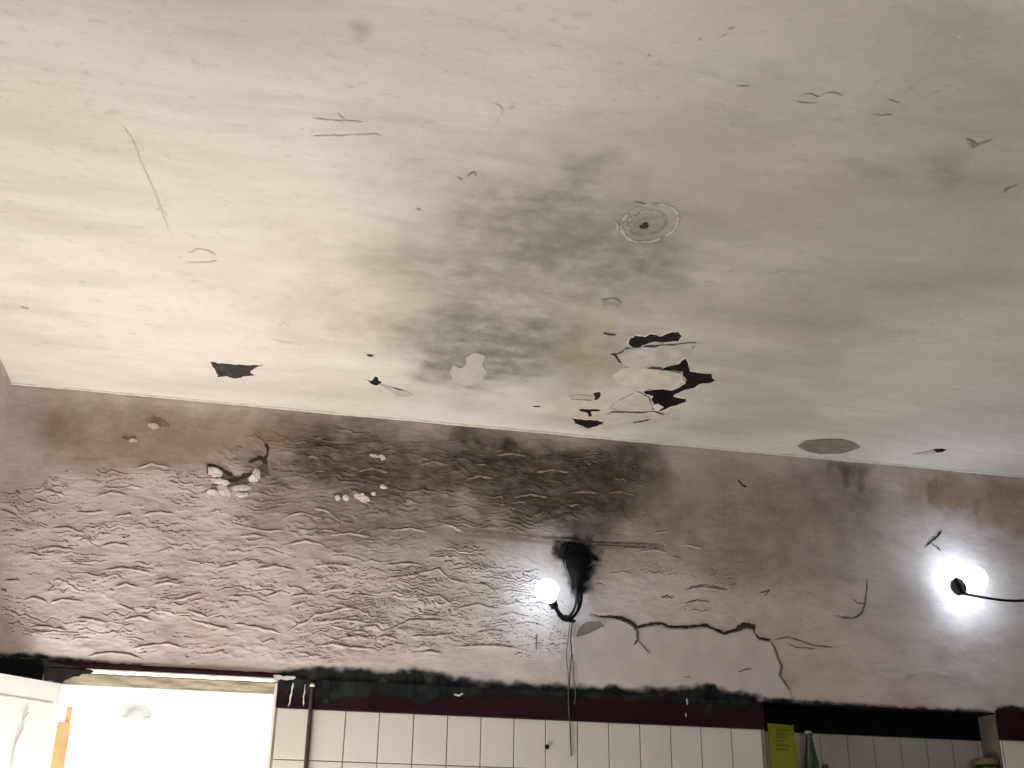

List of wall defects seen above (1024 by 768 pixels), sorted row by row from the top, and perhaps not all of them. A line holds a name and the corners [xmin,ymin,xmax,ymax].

crack [116,123,170,232]
peeling [209,360,264,379]
peeling [364,375,413,397]
peeling [569,330,726,429]
leakage [114,410,235,457]
spalling [206,443,269,497]
spalling [333,484,388,503]
leakage [254,425,652,533]
crack [836,579,868,619]
crack [593,585,835,687]
leakage [318,669,333,706]
leakage [705,685,716,715]